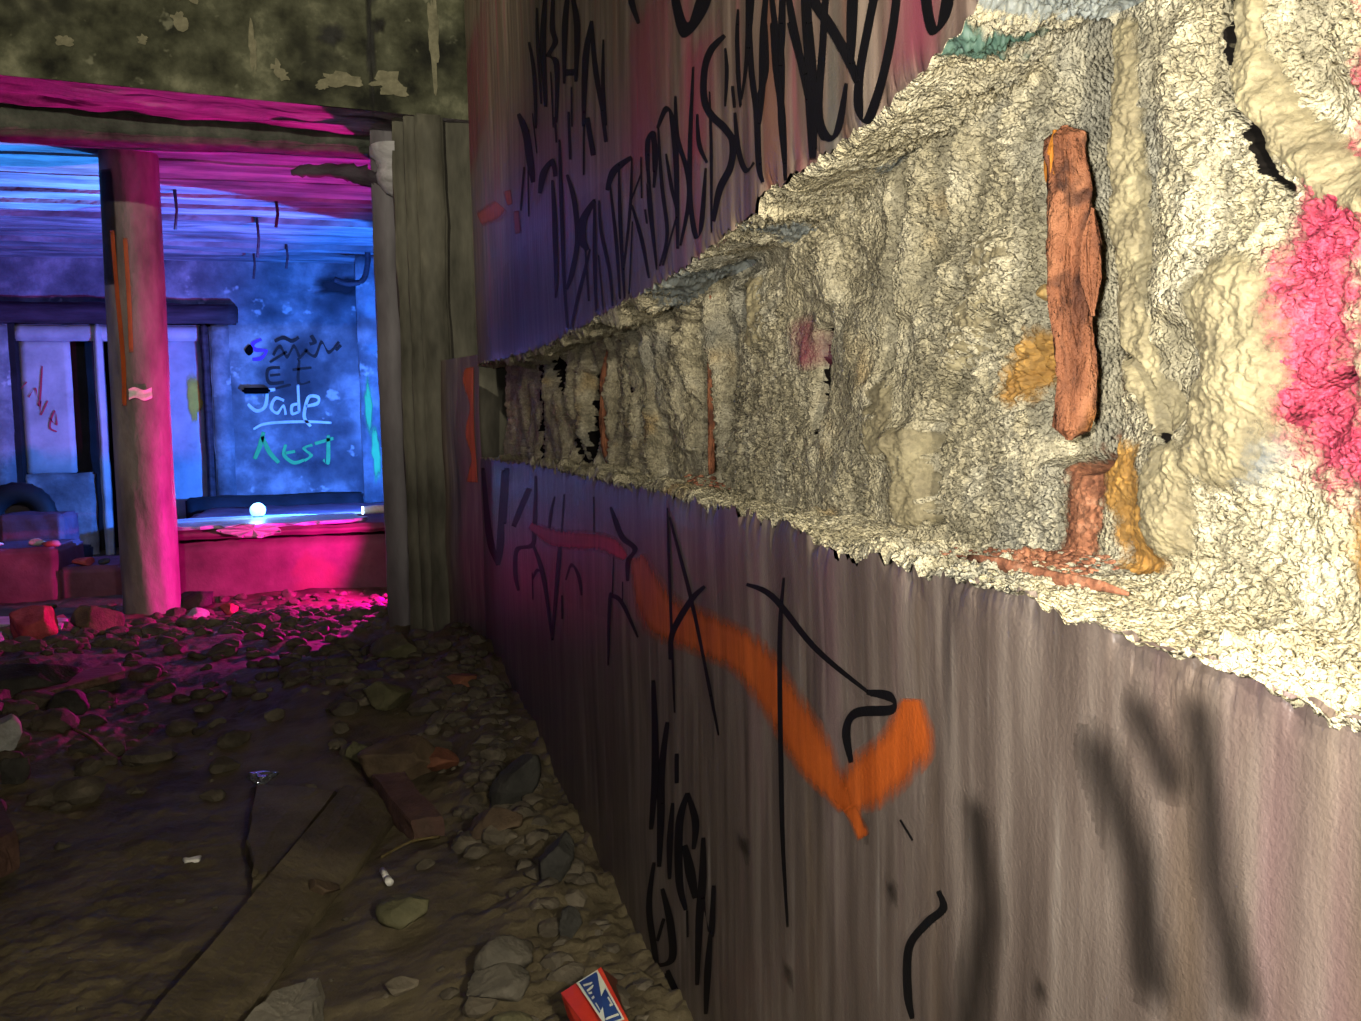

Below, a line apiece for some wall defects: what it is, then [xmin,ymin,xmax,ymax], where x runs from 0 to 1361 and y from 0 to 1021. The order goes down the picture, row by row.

crack [1223,0,1237,65]
crack [1242,122,1297,193]
rust [999,125,1103,440]
spalling [477,0,1361,733]
rust [966,436,1165,596]